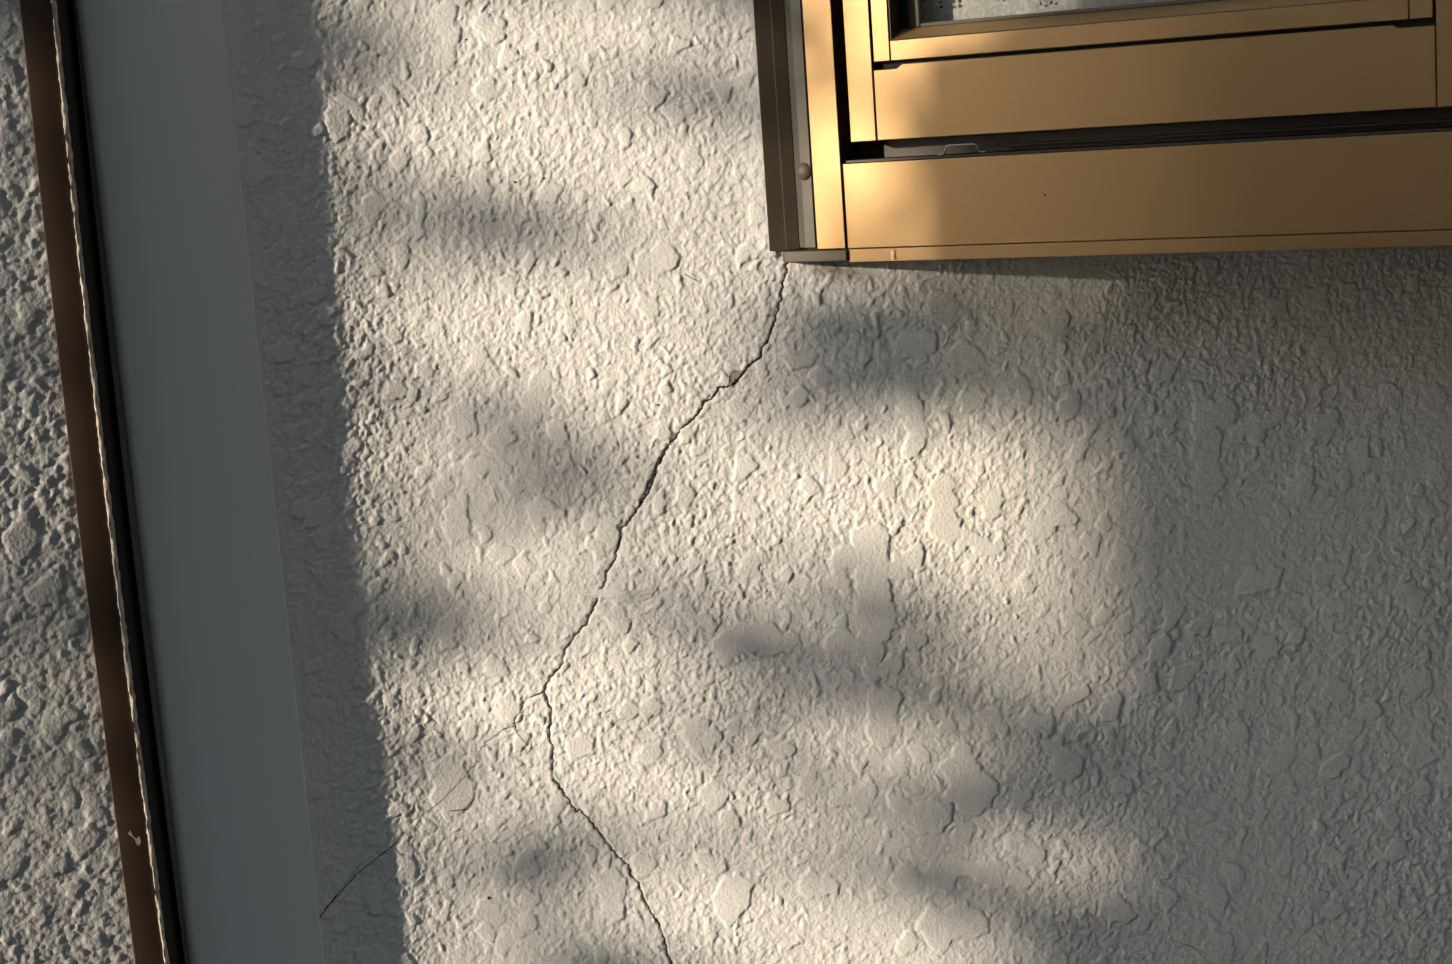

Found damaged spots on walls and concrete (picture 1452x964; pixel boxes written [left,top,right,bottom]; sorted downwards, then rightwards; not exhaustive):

crack [319,262,789,964]